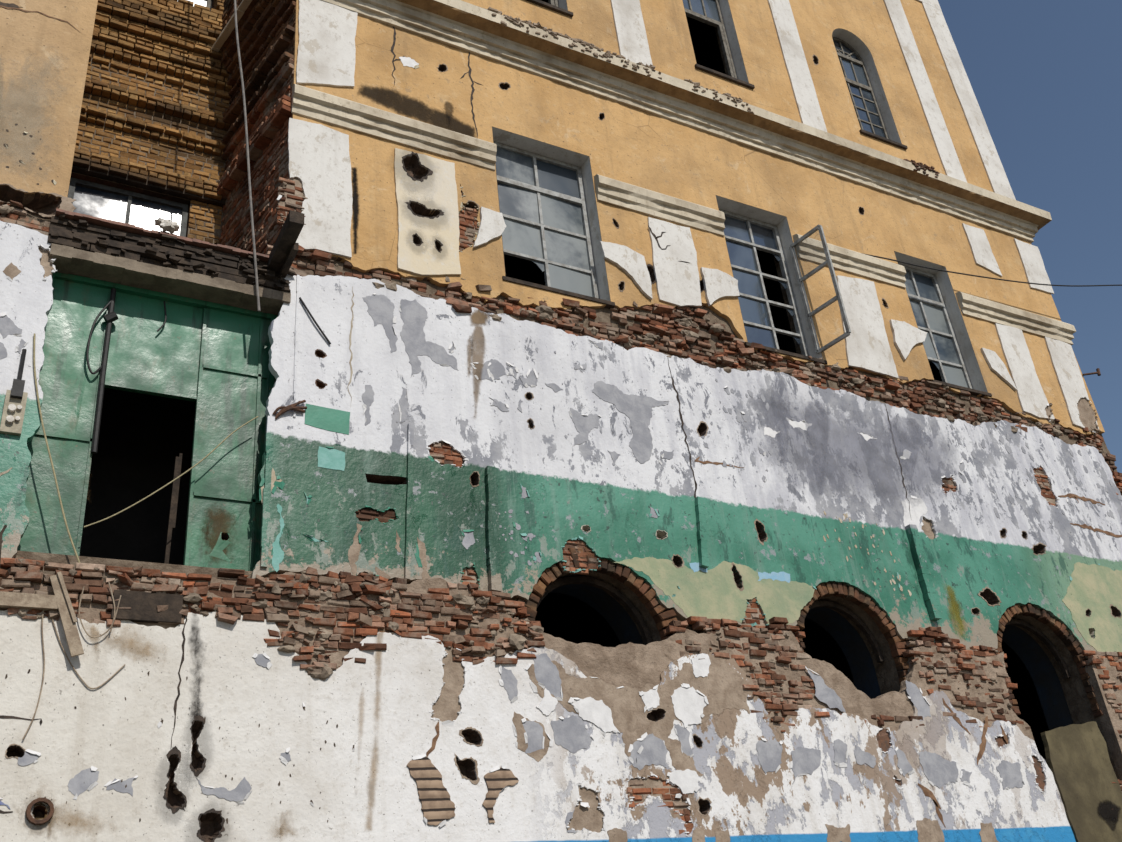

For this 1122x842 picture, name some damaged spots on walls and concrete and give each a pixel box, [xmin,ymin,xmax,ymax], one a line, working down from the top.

crack [0,5,80,32]
crack [391,27,417,85]
crack [460,52,482,137]
spalling [478,6,662,79]
flaking render [0,152,76,282]
spalling [276,177,308,226]
spalling [459,187,480,252]
spalling [290,245,1122,539]
crack [668,360,744,498]
crack [171,616,187,747]
spalling [0,468,1048,842]
peeling [1062,562,1122,736]